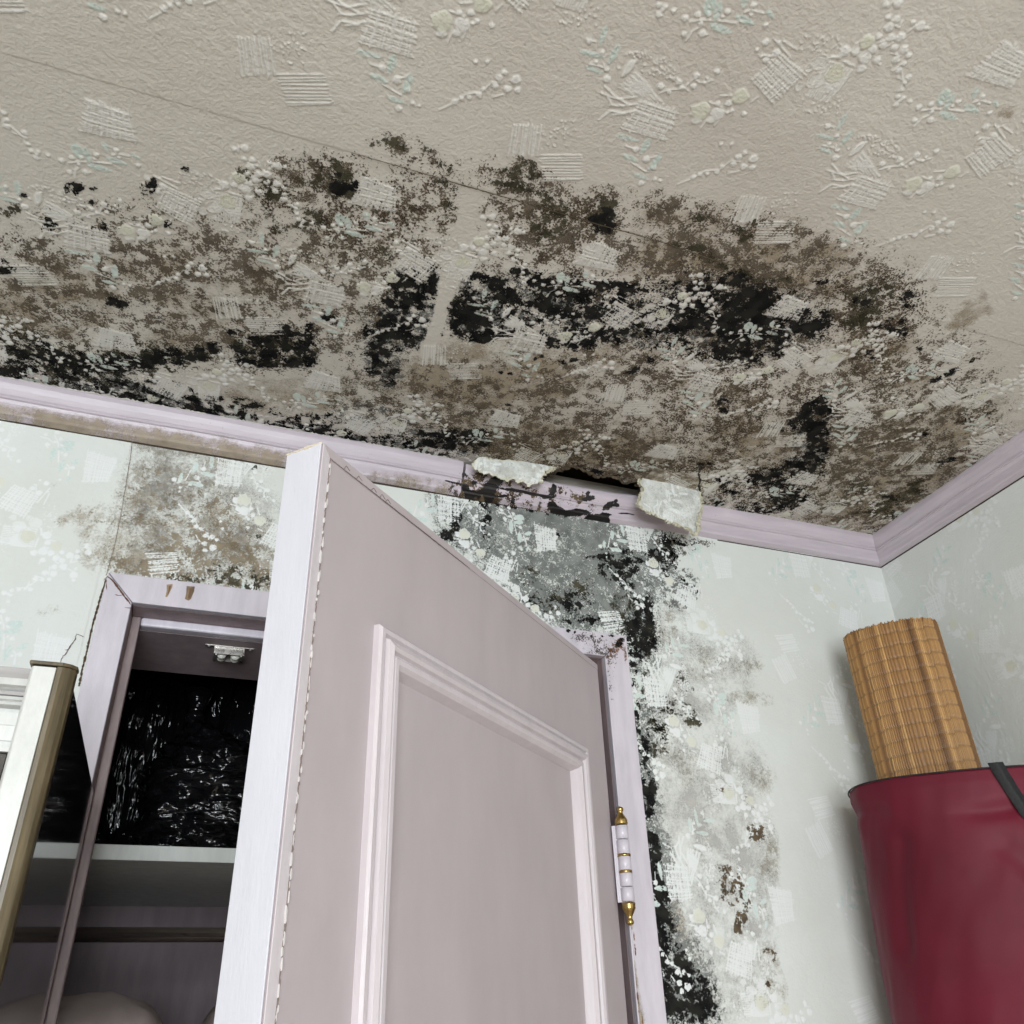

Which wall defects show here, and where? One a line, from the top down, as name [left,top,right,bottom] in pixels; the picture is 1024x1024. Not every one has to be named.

leakage [0,406,285,590]
leakage [0,131,1016,534]
leakage [395,472,725,1024]
leakage [676,742,777,936]